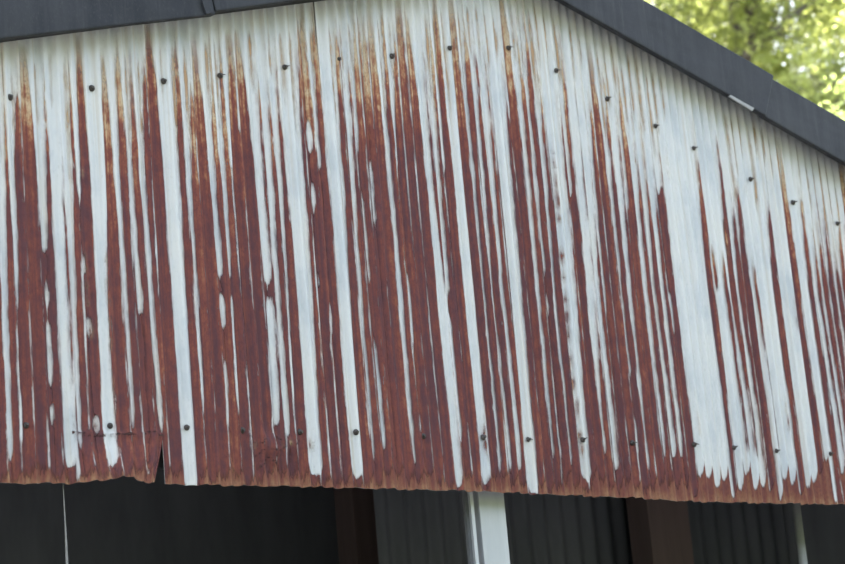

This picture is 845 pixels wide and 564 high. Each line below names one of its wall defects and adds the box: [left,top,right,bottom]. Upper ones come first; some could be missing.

rust [0,39,185,485]
rust [174,4,845,505]